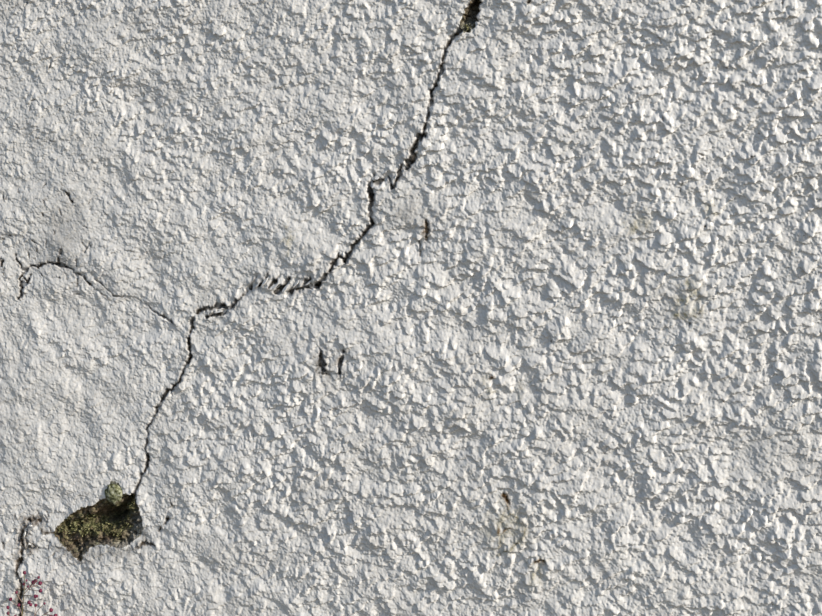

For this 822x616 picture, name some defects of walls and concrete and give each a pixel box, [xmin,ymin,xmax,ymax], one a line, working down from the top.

crack [0,251,123,301]
crack [134,0,478,495]
crack [16,516,42,616]
spalling [41,481,144,564]